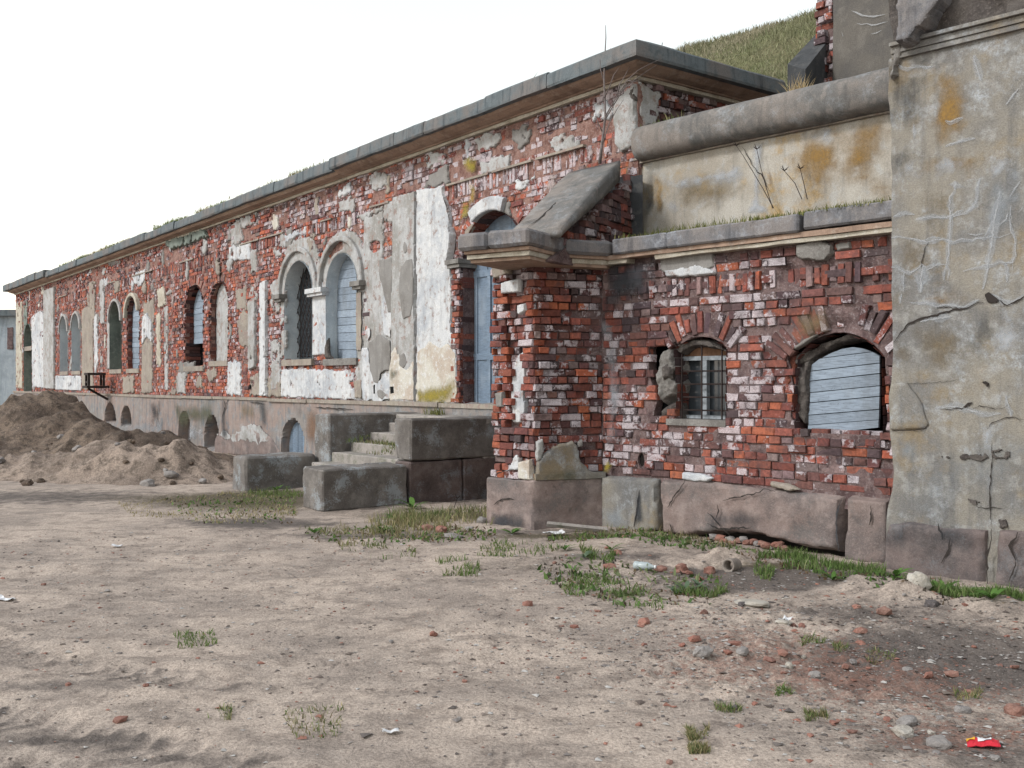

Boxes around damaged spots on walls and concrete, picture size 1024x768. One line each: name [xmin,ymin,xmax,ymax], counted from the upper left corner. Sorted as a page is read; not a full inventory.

flaking render [591,81,661,153]
flaking render [464,124,532,174]
flaking render [550,133,581,152]
flaking render [497,176,535,217]
flaking render [16,151,475,403]
flaking render [492,268,528,315]
crack [894,292,1024,342]
flaking render [495,352,529,424]
crack [707,489,775,534]
crack [894,402,1024,584]